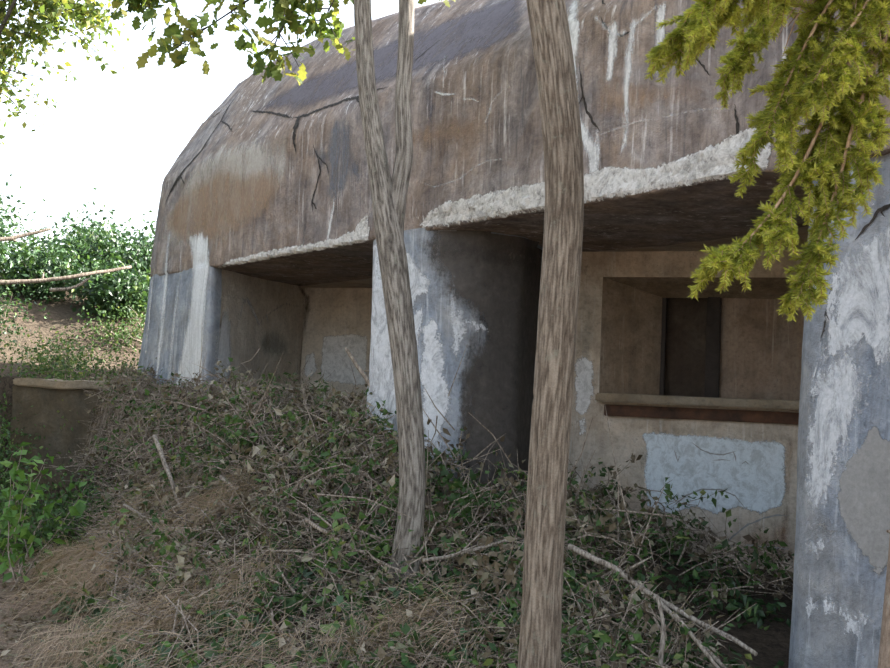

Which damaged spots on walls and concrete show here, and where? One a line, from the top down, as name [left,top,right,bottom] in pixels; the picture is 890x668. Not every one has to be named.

crack [166,99,234,201]
crack [253,87,386,211]
crack [855,204,890,240]
leakage [429,222,542,514]